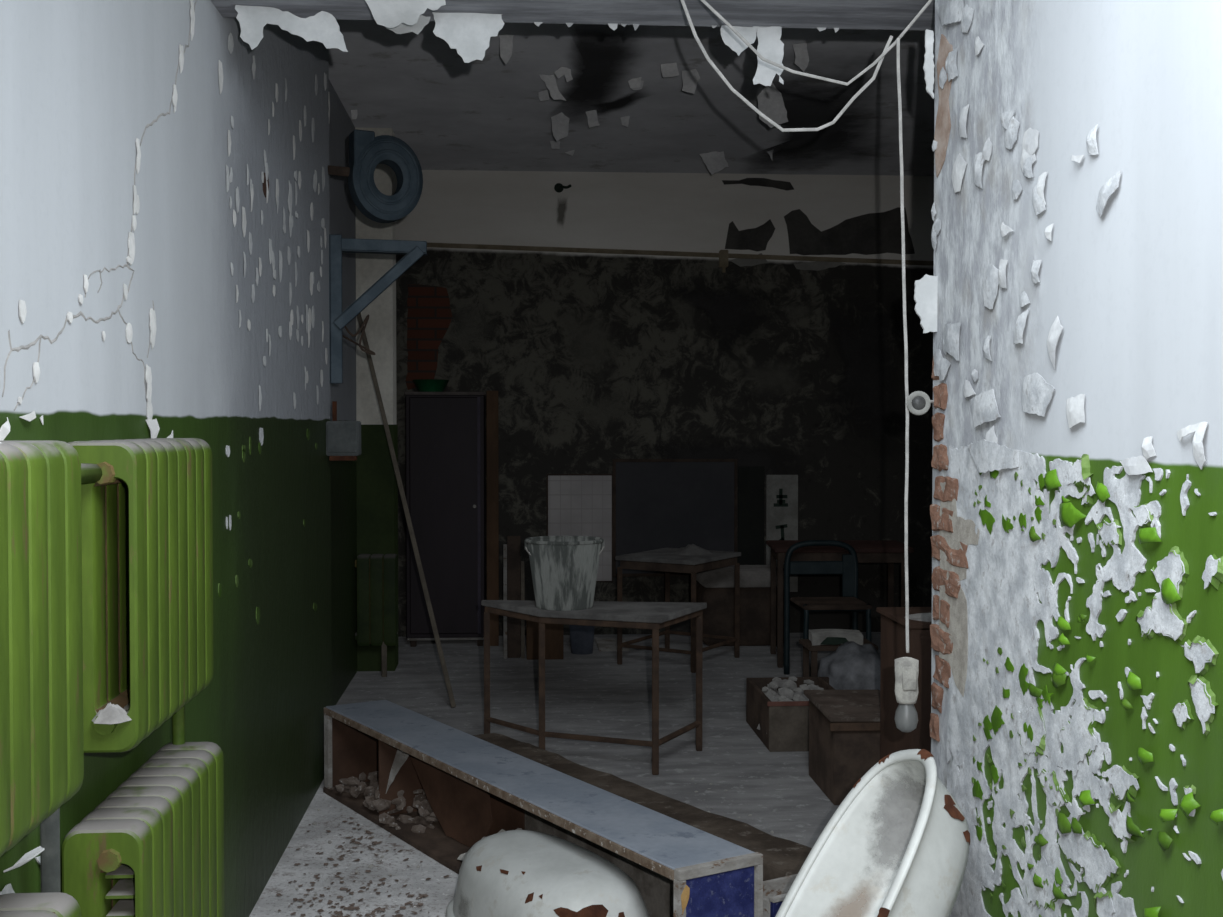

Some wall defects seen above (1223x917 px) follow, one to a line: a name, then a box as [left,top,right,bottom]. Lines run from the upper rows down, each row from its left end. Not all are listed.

peeling [218,5,348,94]
peeling [365,0,514,64]
peeling [538,67,575,156]
flaking render [923,0,1054,241]
crack [2,0,197,420]
peeling [226,105,328,409]
peeling [699,151,794,190]
peeling [725,207,915,271]
flaking render [931,202,941,251]
flaking render [983,259,1008,309]
spalling [226,428,264,462]
flaking render [914,274,1223,917]